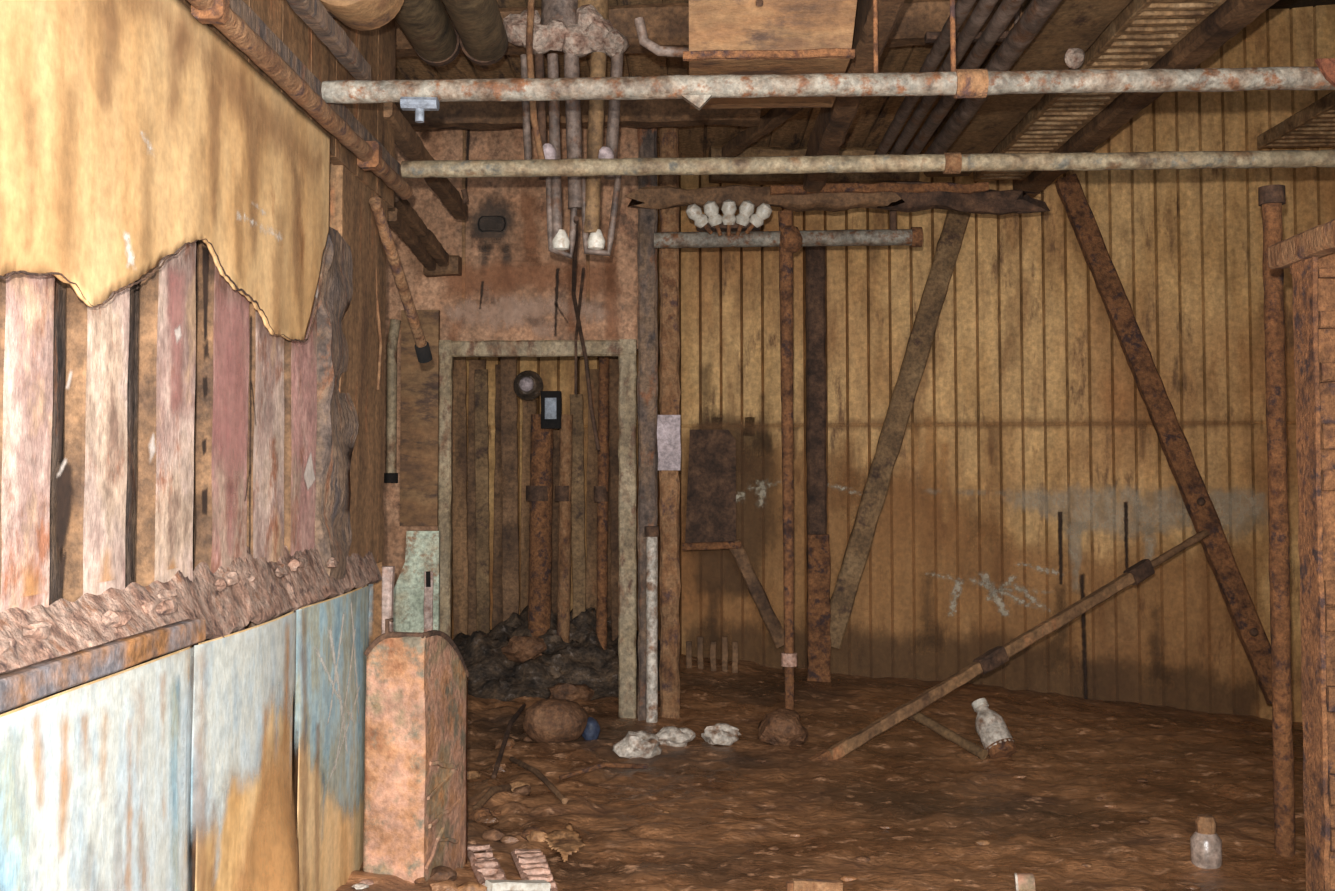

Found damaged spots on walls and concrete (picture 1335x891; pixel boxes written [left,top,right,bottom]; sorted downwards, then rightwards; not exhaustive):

peeling [88,239,330,343]
spalling [56,367,73,589]
peeling [304,453,315,490]
spalling [213,570,257,592]
spalling [274,555,309,578]
peeling [0,586,369,891]